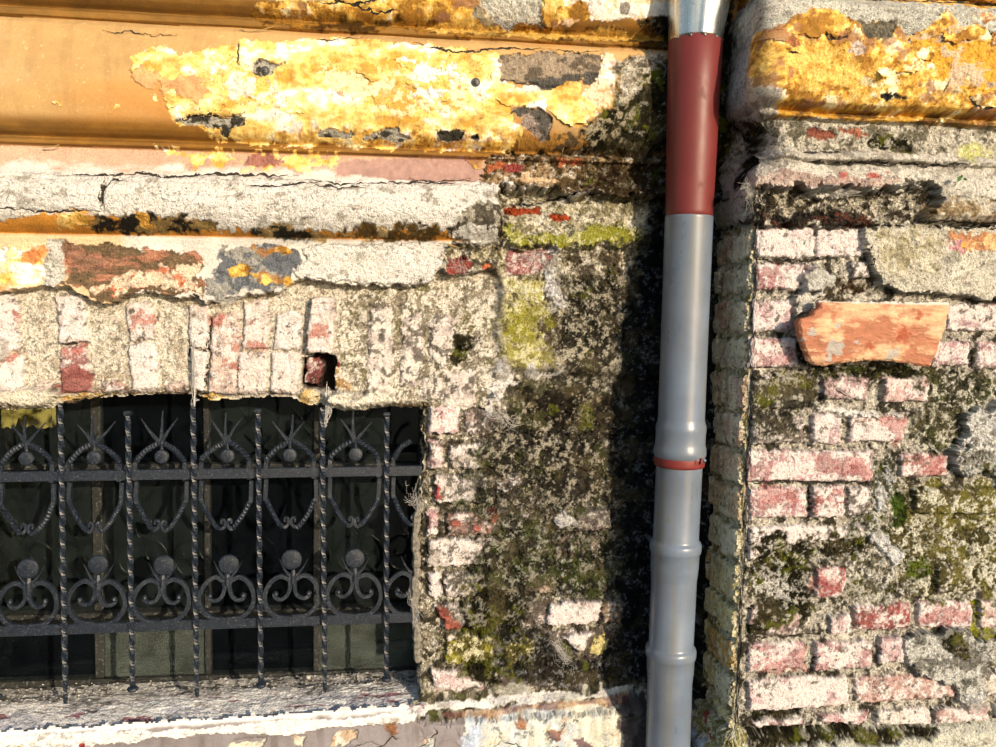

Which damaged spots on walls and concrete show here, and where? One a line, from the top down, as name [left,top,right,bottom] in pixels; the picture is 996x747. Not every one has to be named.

crack [320,0,395,42]
peeling [256,0,668,33]
crack [417,42,597,55]
peeling [723,0,996,141]
crack [0,171,473,213]
flaking render [715,146,724,198]
peeling [0,37,666,747]
damp [481,358,565,429]
damp [604,190,666,694]
damp [692,220,723,710]
damp [554,511,578,529]
damp [869,464,905,566]